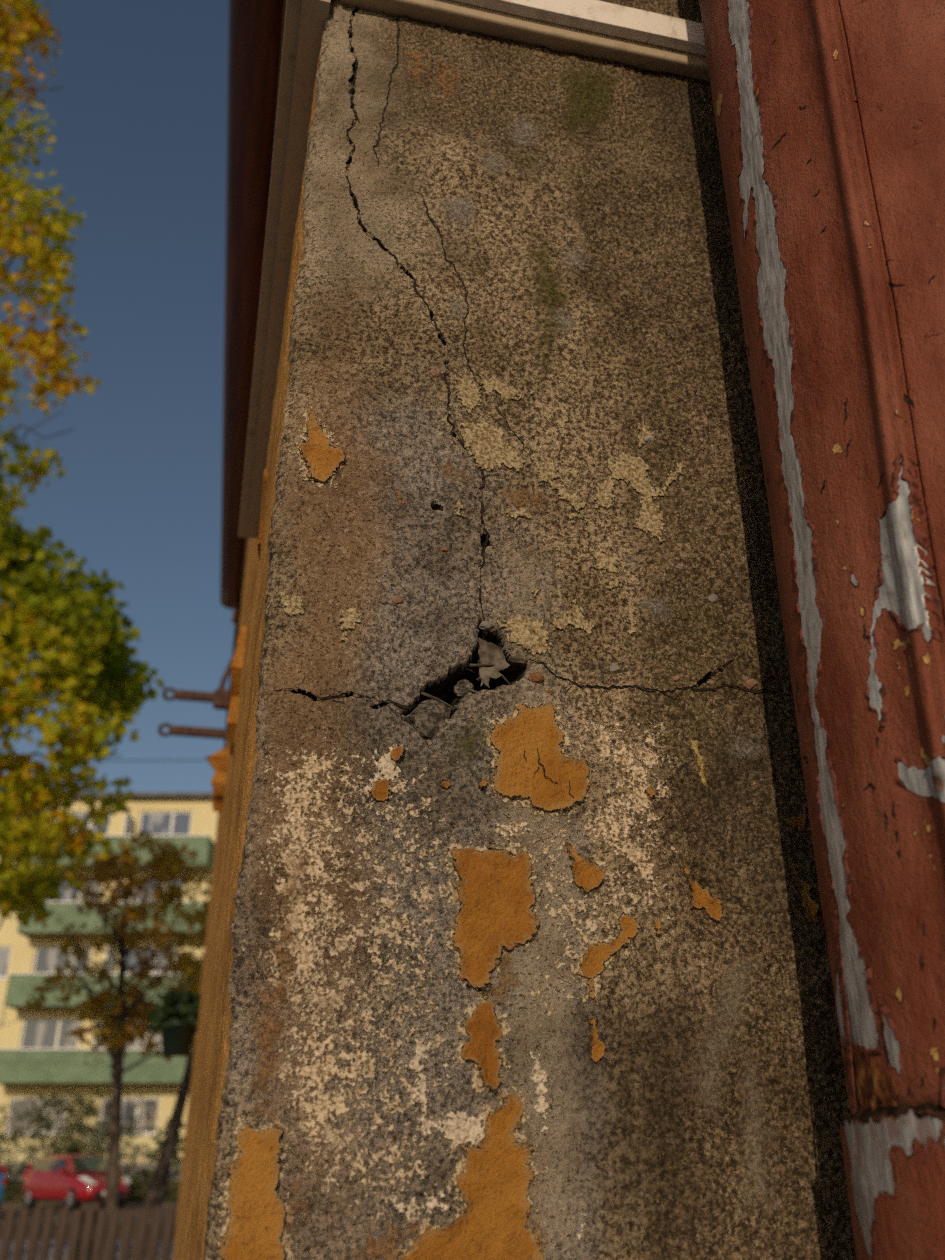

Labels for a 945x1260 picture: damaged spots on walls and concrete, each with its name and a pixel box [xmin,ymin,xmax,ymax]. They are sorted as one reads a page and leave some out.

crack [345,7,533,615]
peeling [206,626,247,812]
crack [273,688,428,744]
spalling [404,627,527,740]
peeling [478,697,600,822]
crack [529,658,808,777]
peeling [727,0,945,1260]
peeling [566,841,605,893]
peeling [683,860,723,922]
peeling [387,838,548,1260]
peeling [566,900,662,1064]
peeling [215,1110,301,1260]